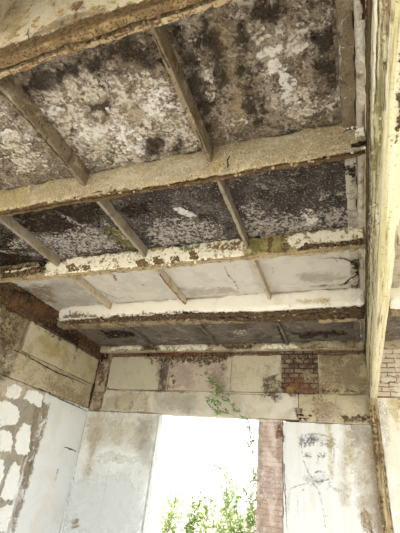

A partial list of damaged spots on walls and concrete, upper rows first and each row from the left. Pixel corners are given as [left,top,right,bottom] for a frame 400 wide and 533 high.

peeling [24,4,106,37]
damp [0,0,389,394]
peeling [45,239,247,276]
spalling [60,304,365,342]
damp [261,366,283,403]
peeling [0,384,44,455]
peeling [0,459,21,533]